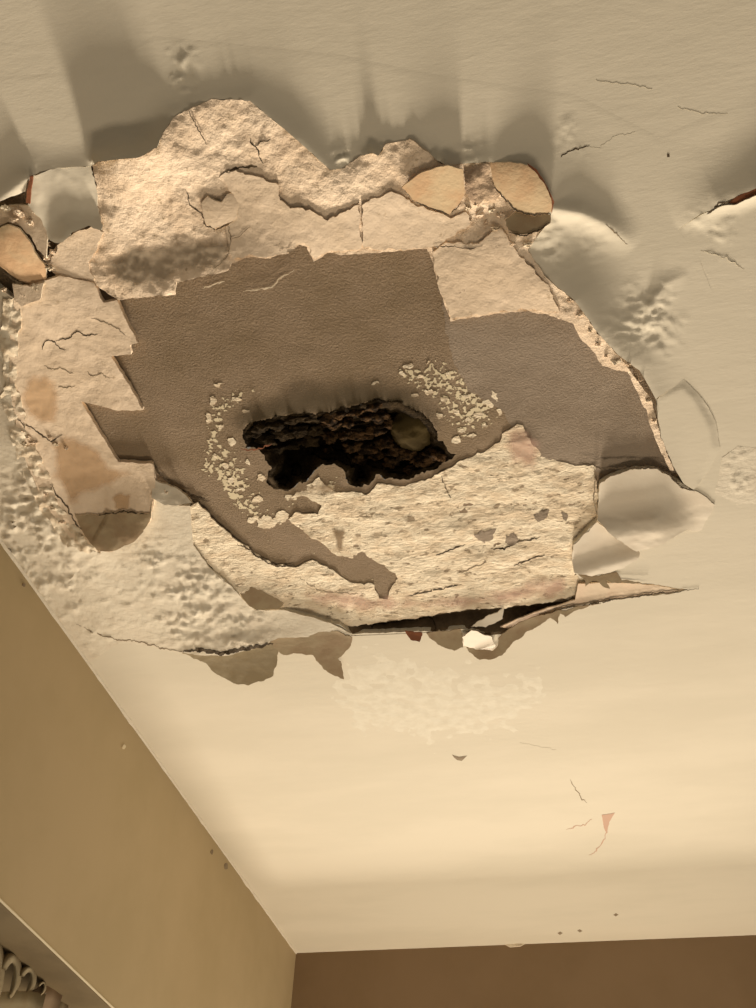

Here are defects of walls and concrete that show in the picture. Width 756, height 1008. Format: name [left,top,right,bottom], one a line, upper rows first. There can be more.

crack [561,132,633,157]
crack [42,318,123,388]
flaking render [0,99,714,685]